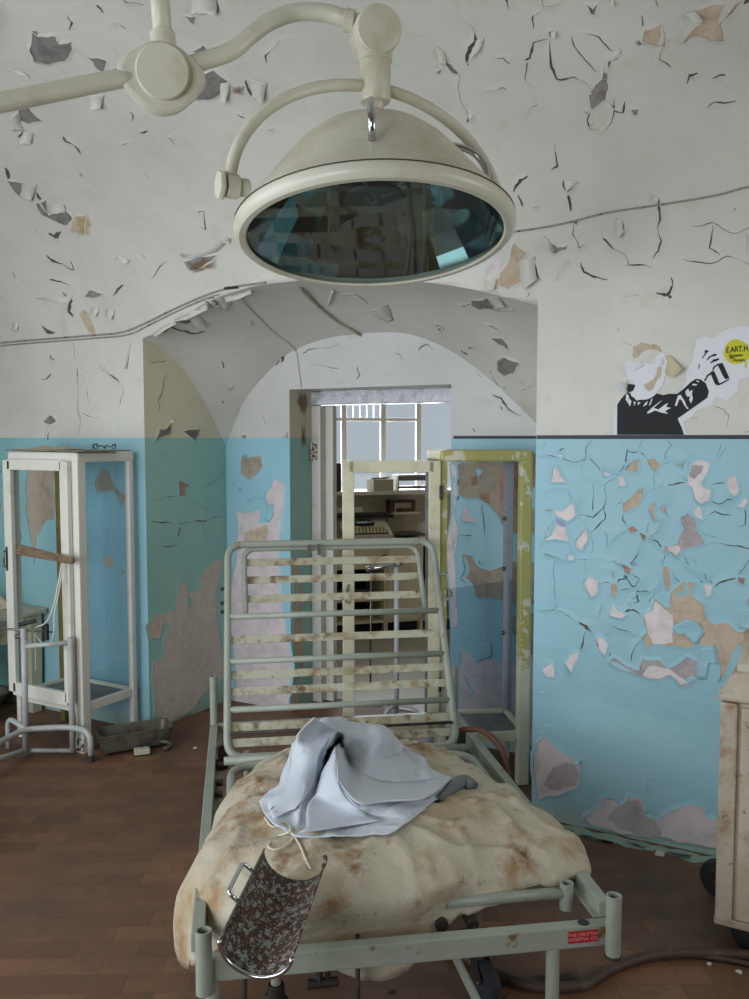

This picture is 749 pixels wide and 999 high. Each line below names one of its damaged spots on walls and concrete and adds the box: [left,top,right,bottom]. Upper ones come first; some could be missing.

peeling [26,29,110,72]
peeling [194,68,268,105]
crack [687,73,737,110]
peeling [0,167,89,237]
peeling [179,234,231,273]
peeling [447,239,544,313]
crack [509,144,749,303]
crack [41,341,167,434]
flaking render [145,453,305,723]
peeling [447,462,518,640]
flaking render [580,454,749,690]
flaking render [529,559,718,863]